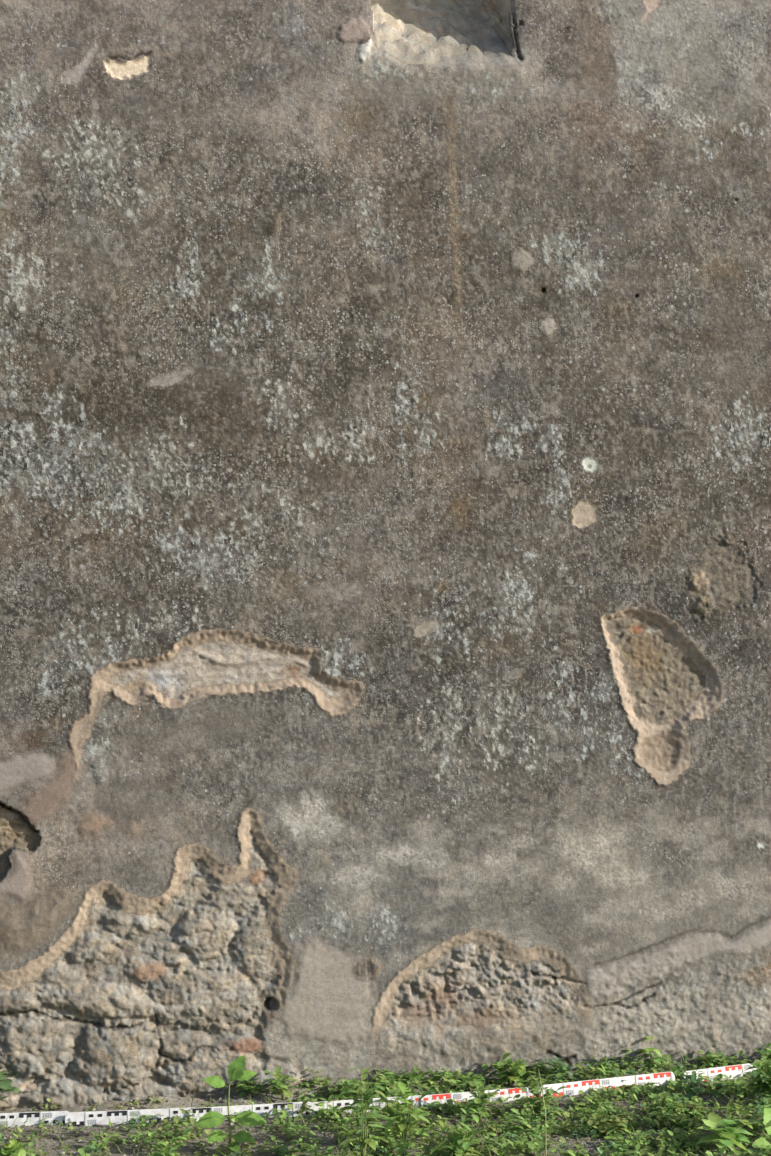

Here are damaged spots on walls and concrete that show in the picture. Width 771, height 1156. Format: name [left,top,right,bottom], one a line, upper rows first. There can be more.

flaking render [60,36,152,85]
spalling [69,628,365,770]
spalling [601,605,724,785]
spalling [0,804,306,1111]
spalling [373,929,592,1062]
crack [593,983,660,1009]
crack [532,919,763,984]